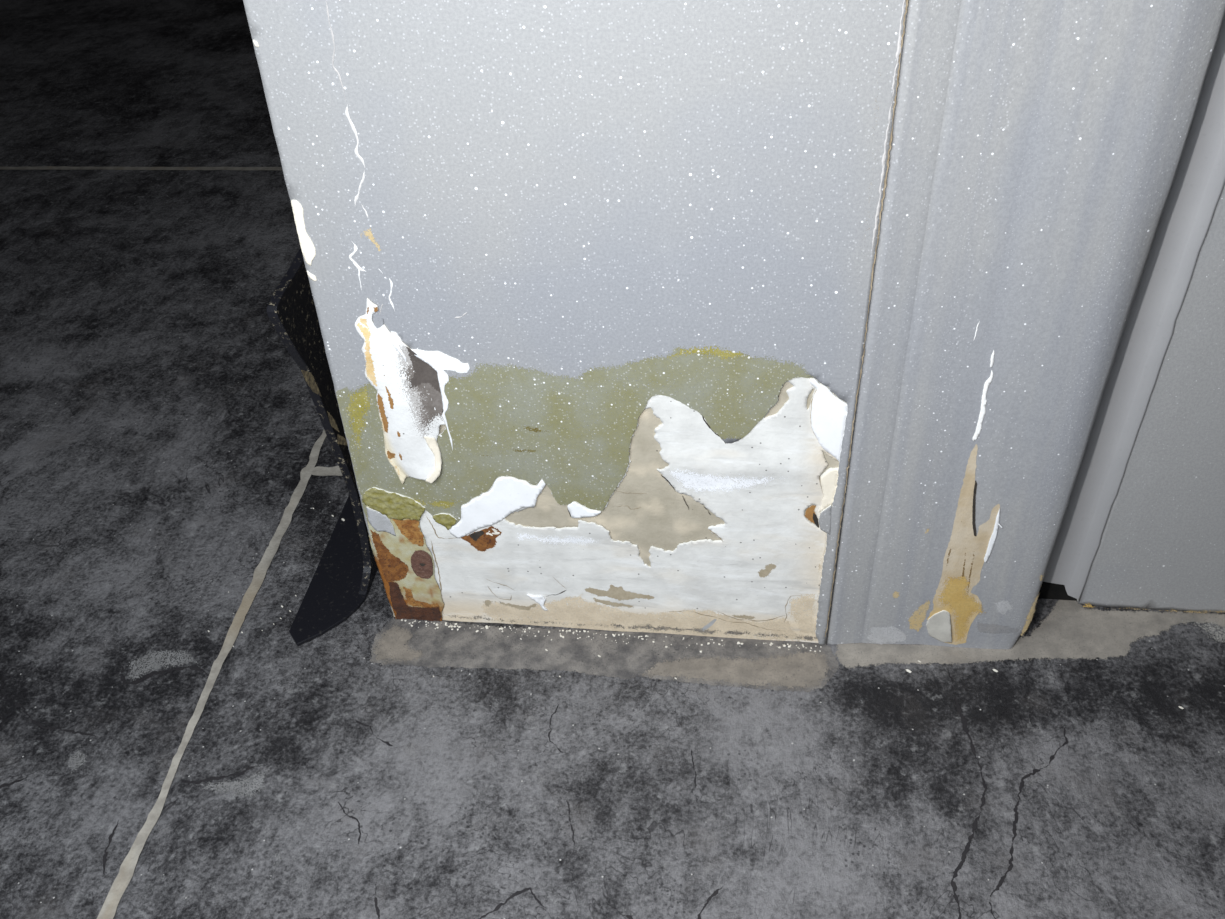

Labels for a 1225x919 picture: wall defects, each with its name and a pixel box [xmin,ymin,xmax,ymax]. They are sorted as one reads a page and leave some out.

peeling [291,200,317,281]
peeling [355,298,470,484]
damp [336,344,813,524]
peeling [366,507,396,536]
rust [370,530,442,621]
rust [393,519,424,546]
peeling [419,377,848,643]
damp [908,574,986,641]
crack [927,321,1068,919]
damp [1021,575,1044,636]